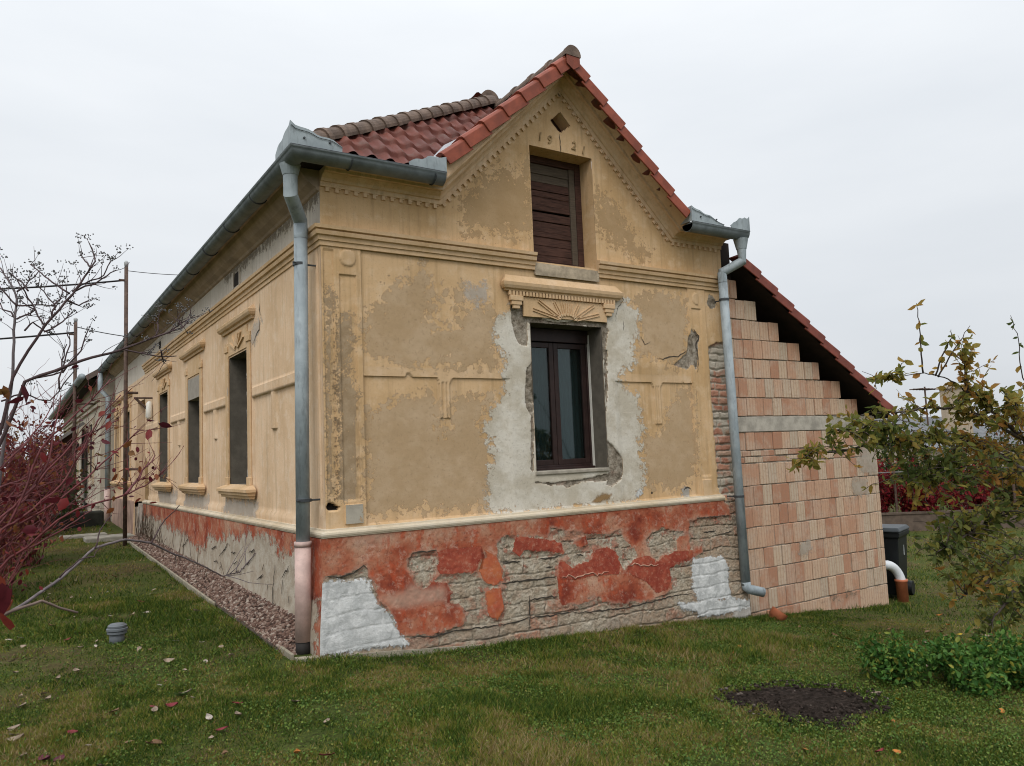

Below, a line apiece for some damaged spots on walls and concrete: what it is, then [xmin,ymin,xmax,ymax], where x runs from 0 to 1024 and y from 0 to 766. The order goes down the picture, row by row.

spalling [143,513,295,615]
spalling [310,258,749,657]